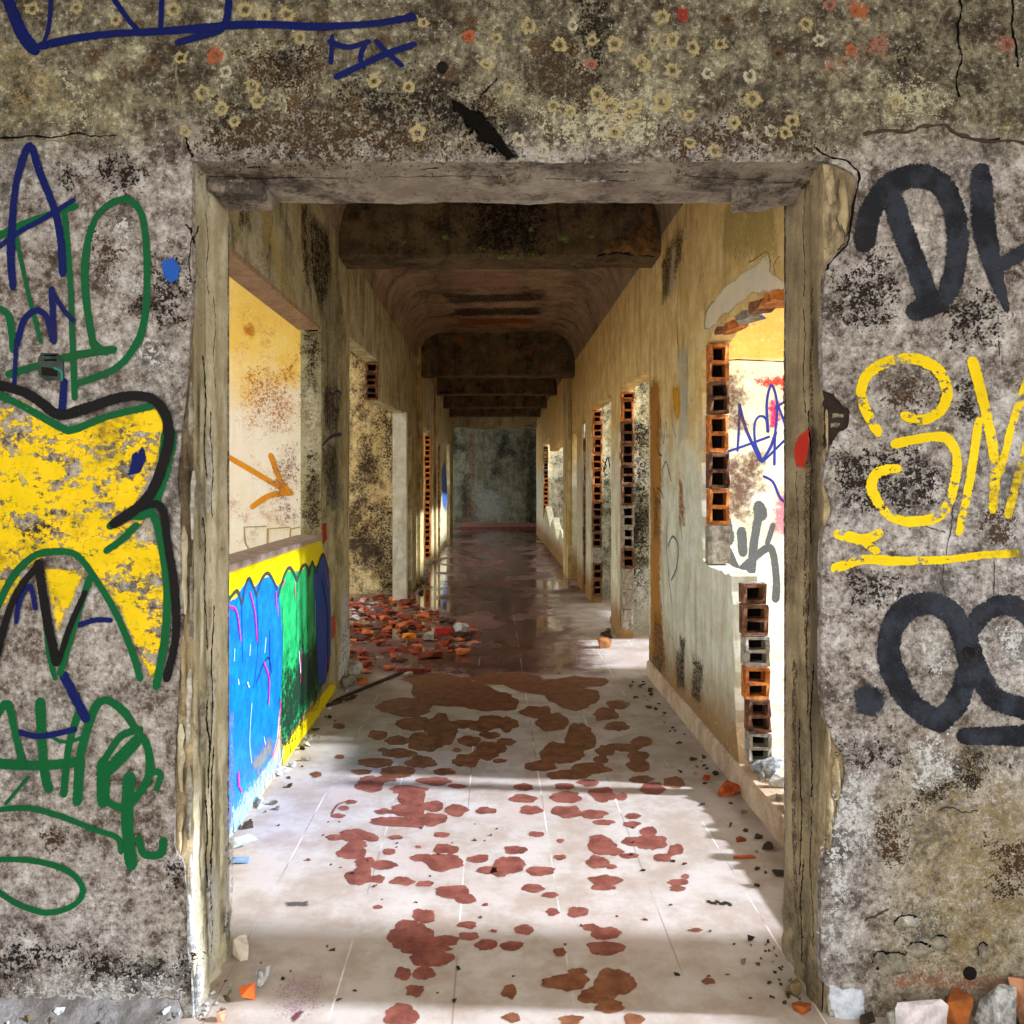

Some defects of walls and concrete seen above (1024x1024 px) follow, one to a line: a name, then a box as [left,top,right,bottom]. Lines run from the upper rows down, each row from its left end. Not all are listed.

crack [0,132,117,144]
crack [210,166,338,179]
crack [388,77,635,182]
crack [686,174,764,182]
crack [863,0,1024,145]
water stain [235,202,393,594]
flaking render [704,251,784,564]
crack [795,147,861,561]
crack [185,214,234,953]
crack [798,583,814,961]